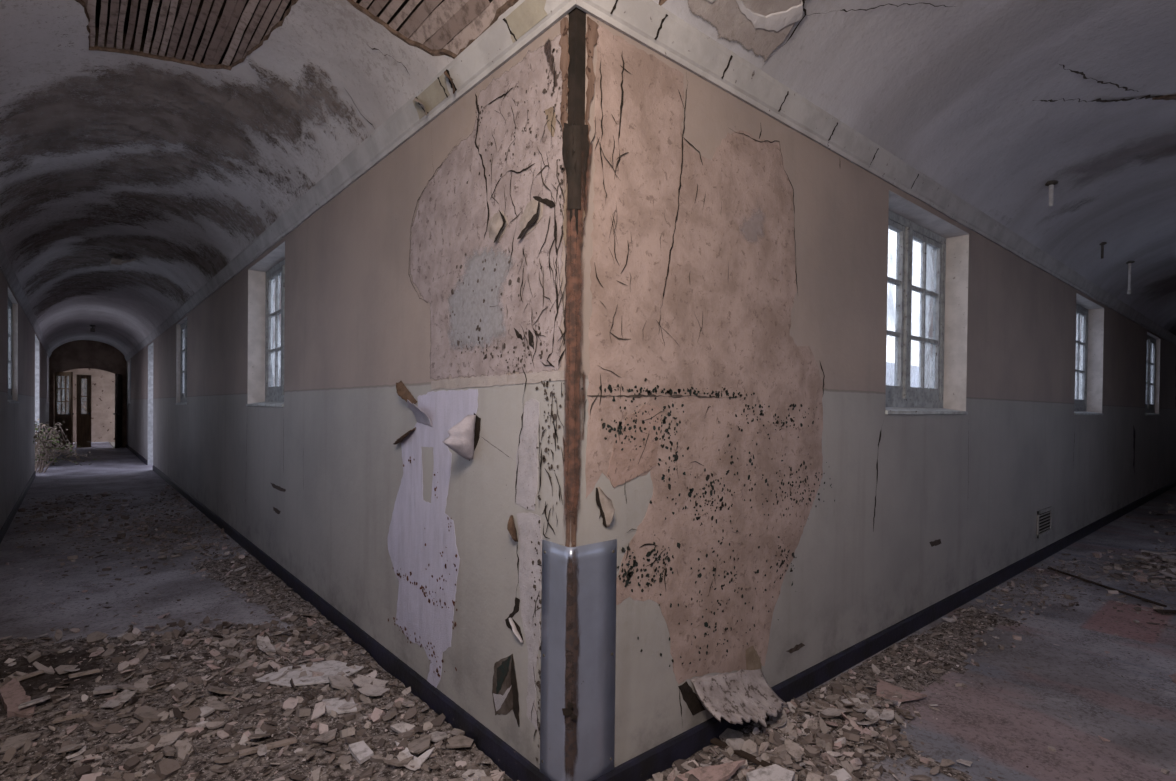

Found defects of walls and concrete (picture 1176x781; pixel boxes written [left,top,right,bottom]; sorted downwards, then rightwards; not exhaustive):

flaking render [76,0,298,71]
peeling [347,0,547,59]
crack [654,14,668,40]
flaking render [688,0,803,62]
crack [768,0,955,59]
crack [1032,64,1176,102]
peeling [0,142,315,321]
crack [731,91,798,293]
crack [370,47,722,617]
rust [563,140,592,526]
peeling [387,16,835,731]
rust [564,551,580,781]